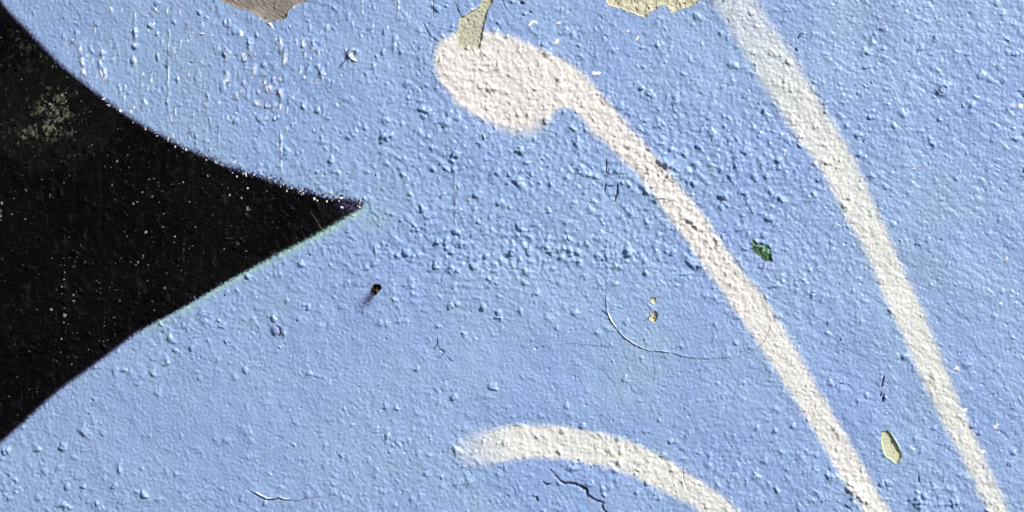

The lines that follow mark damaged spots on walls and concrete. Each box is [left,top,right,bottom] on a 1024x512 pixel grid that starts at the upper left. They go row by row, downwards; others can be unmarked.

peeling [222,0,307,29]
peeling [606,0,699,19]
peeling [448,0,493,76]
peeling [881,430,902,464]
crack [536,468,607,512]